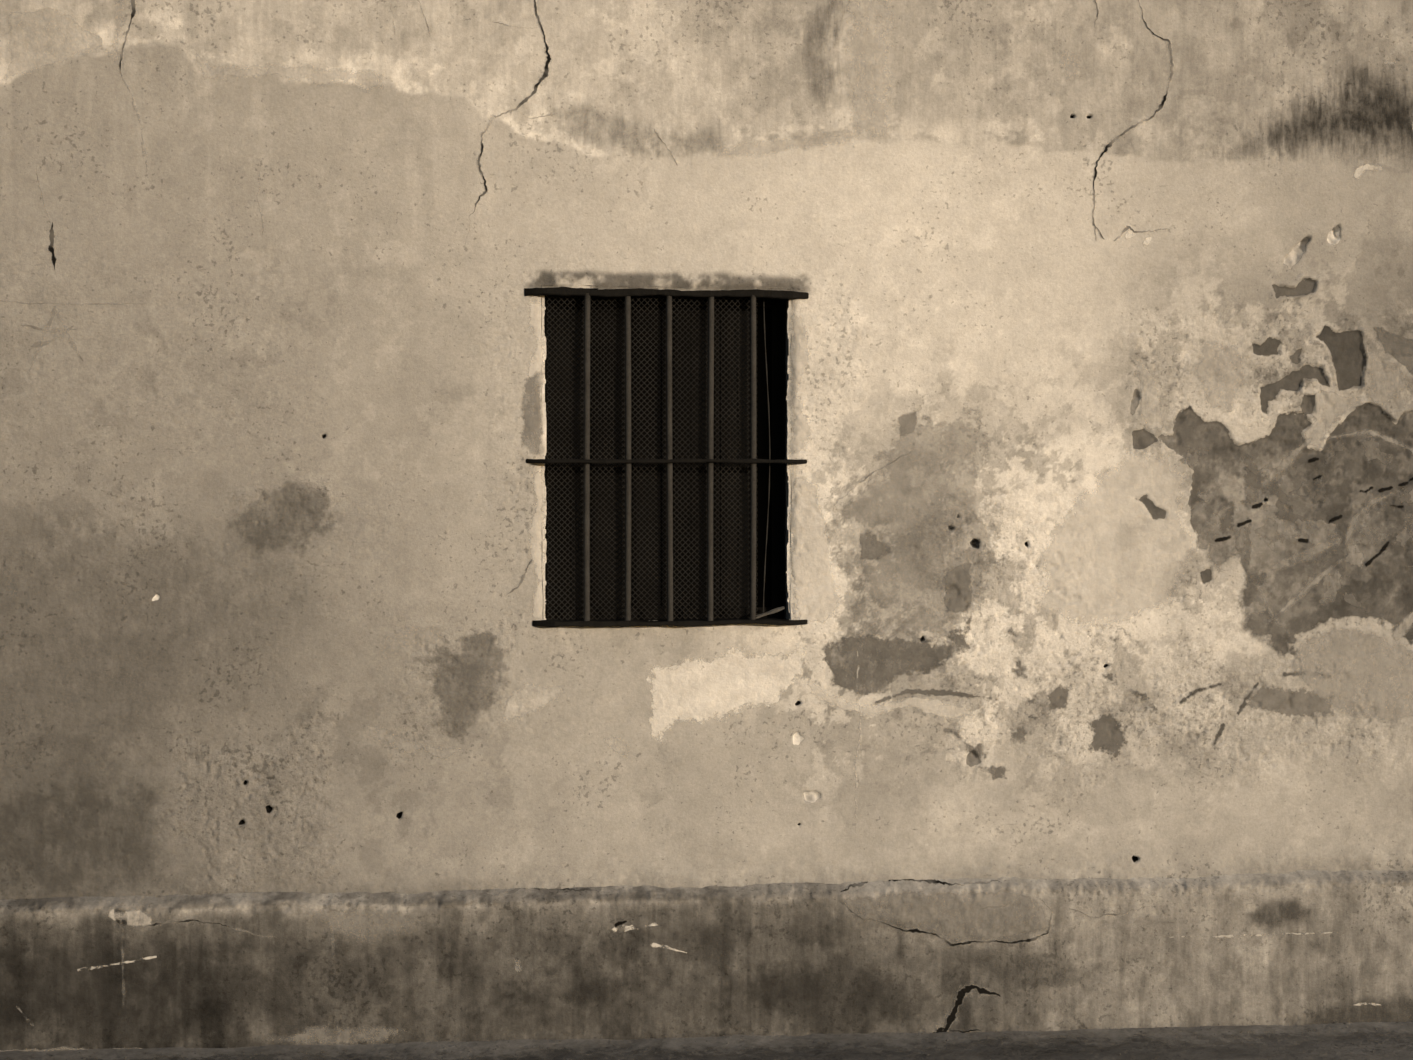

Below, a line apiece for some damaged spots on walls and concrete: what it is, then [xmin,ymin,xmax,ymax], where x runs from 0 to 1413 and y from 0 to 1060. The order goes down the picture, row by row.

crack [119,0,147,168]
crack [464,0,551,250]
crack [1093,0,1174,245]
water stain [1269,76,1413,142]
flaking render [1272,225,1341,298]
flaking render [1131,326,1413,745]
water stain [434,633,501,731]
flaking render [945,729,1006,779]
crack [841,879,1002,892]
water stain [1255,902,1304,924]
crack [933,984,1000,1033]